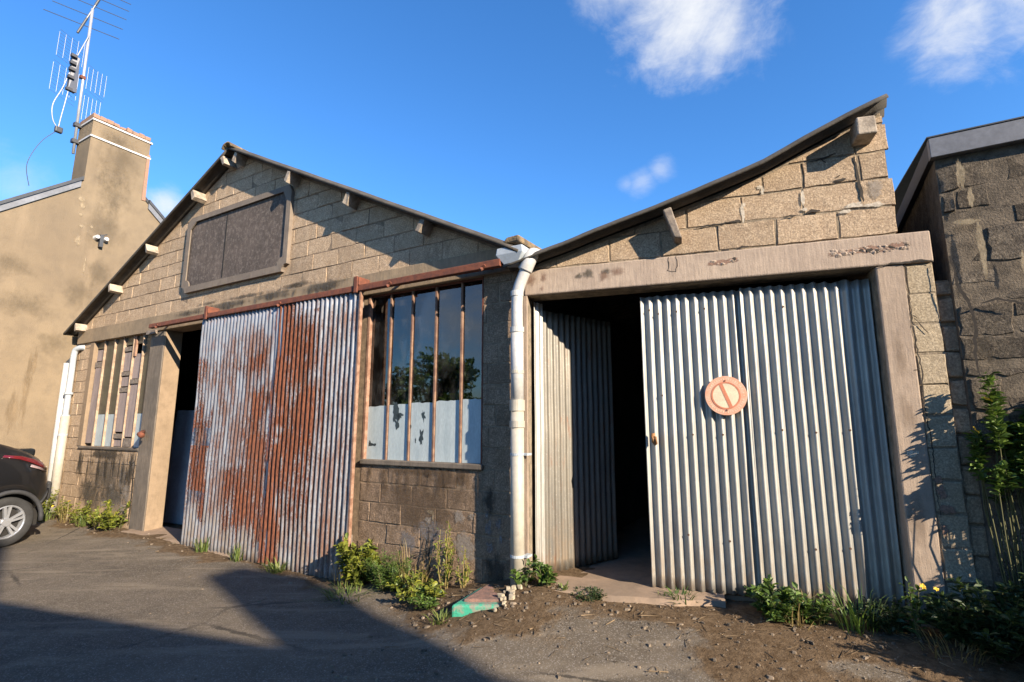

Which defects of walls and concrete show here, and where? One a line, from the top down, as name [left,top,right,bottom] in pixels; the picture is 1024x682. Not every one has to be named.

spalling [708,257,740,265]
spalling [829,241,910,257]
corrosion [184,297,359,580]
peeling [393,402,426,445]
water stain [77,450,134,508]